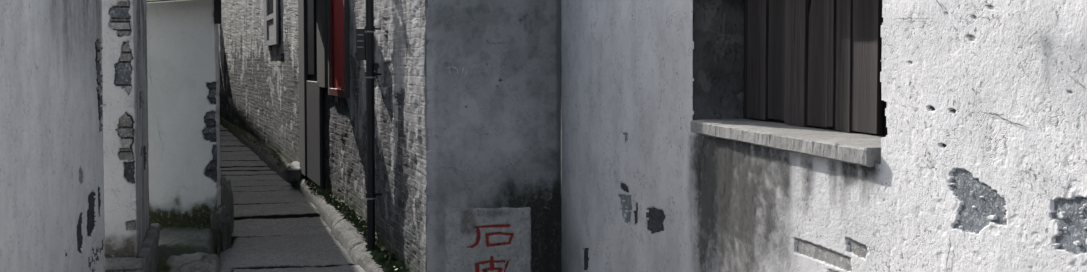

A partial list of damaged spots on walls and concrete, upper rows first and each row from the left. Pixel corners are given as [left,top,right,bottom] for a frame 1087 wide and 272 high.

flaking render [95,0,144,132]
flaking render [202,82,217,182]
spalling [65,166,104,272]
spalling [619,183,665,234]
leakage [692,135,788,272]
flaking render [795,238,869,272]
leakage [829,162,875,193]
spalling [950,169,1007,234]
spalling [1051,197,1087,254]